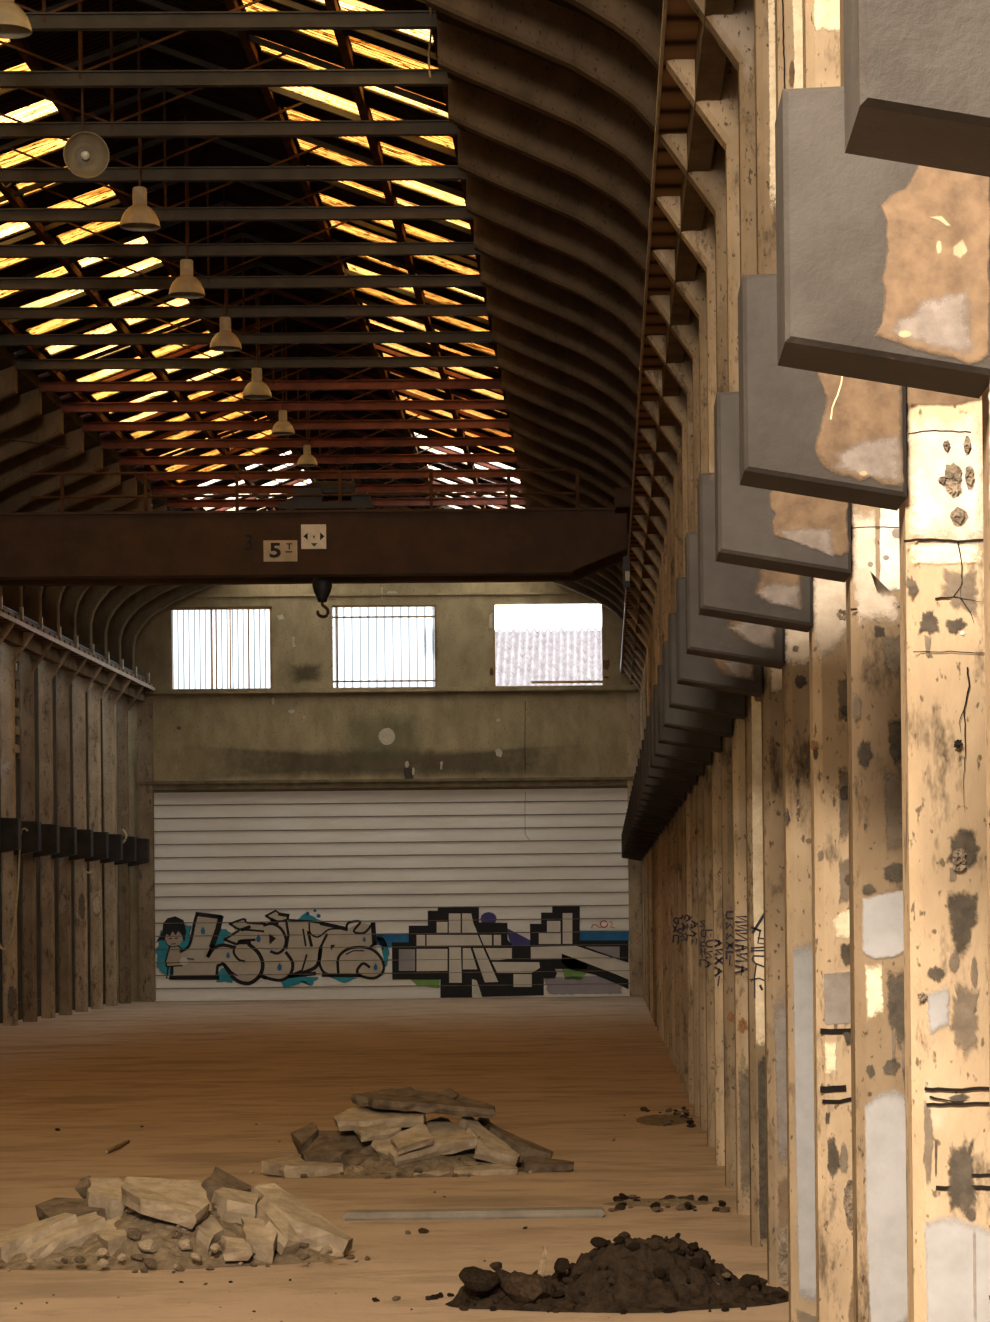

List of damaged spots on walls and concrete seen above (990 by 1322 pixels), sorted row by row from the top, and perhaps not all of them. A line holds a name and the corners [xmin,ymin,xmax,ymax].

peeling [876,165,990,364]
peeling [815,372,982,486]
peeling [769,490,849,556]
peeling [756,569,801,607]
damp [927,829,979,1056]